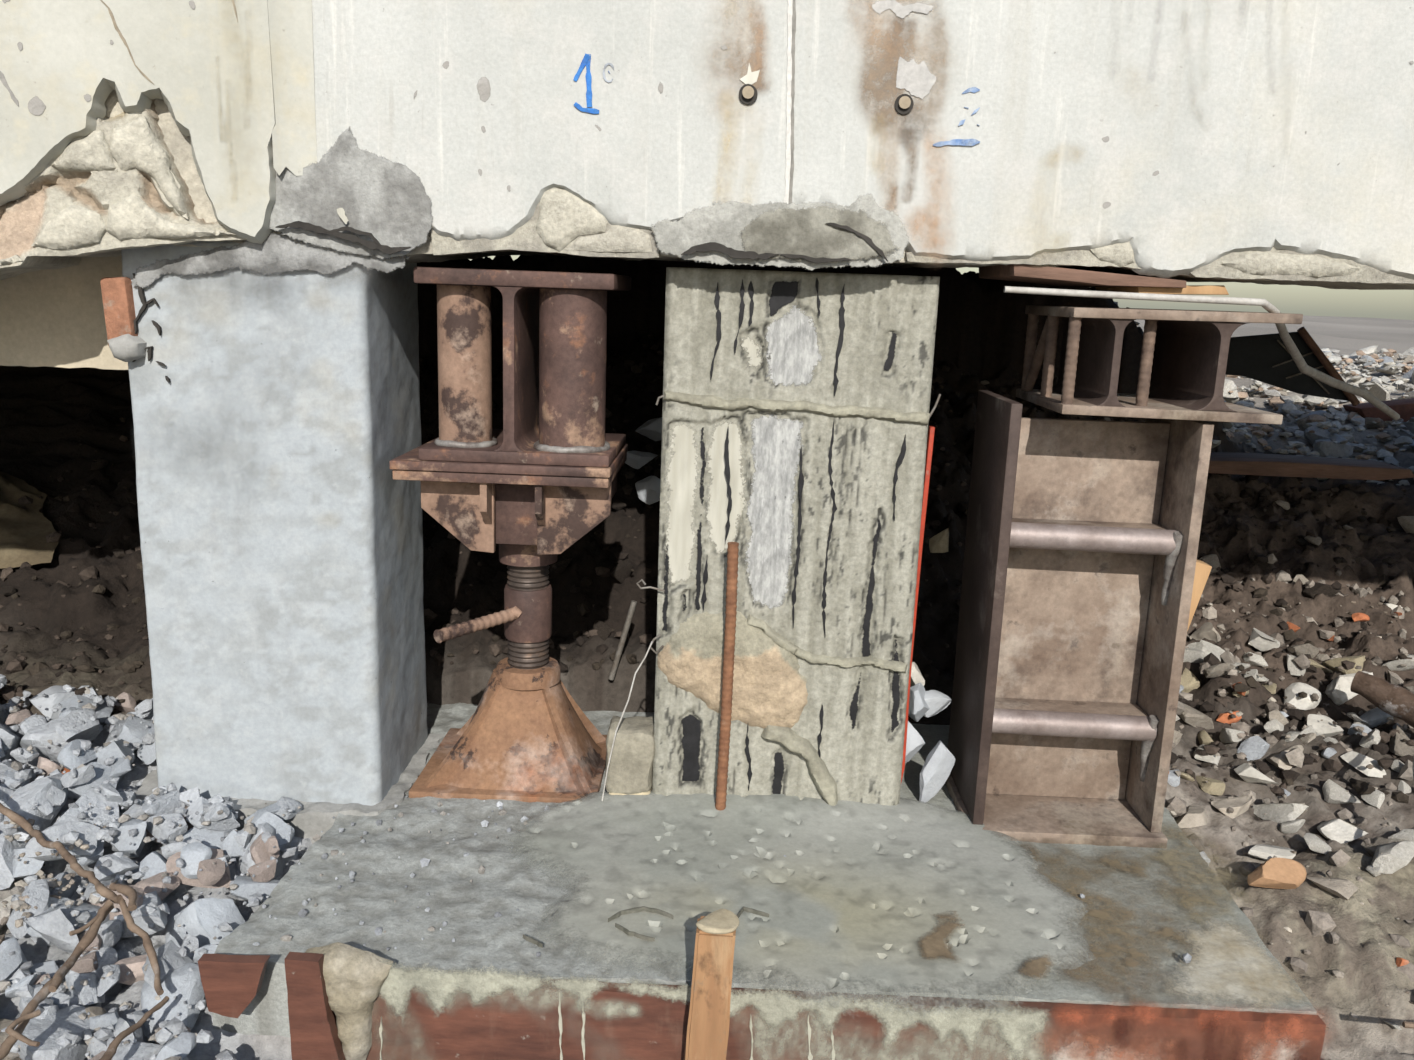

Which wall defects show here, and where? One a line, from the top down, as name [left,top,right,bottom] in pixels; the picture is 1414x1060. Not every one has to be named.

peeling [28,96,46,115]
rust [726,9,765,90]
rust [862,7,946,164]
spalling [0,99,247,270]
spalling [431,187,661,259]
spalling [100,277,138,346]
crack [883,332,897,371]
crack [681,223,888,633]
crack [662,427,732,631]
crack [817,435,906,757]
crack [681,714,701,782]
crack [745,725,785,794]